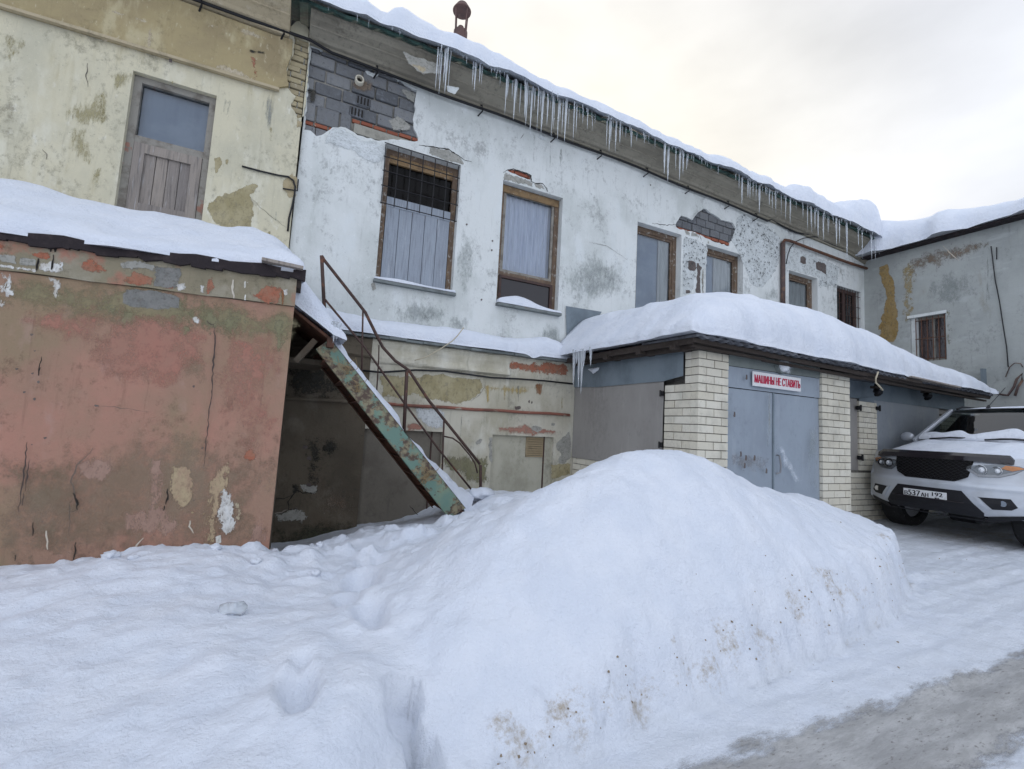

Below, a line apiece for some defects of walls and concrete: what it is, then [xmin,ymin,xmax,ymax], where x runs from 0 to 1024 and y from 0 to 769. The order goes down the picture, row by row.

spalling [287,20,472,164]
peeling [207,184,258,227]
spalling [503,168,548,191]
peeling [0,245,63,307]
peeling [120,261,186,291]
spalling [652,209,839,294]
peeling [878,264,917,342]
crack [204,321,216,464]
flaking render [509,361,568,375]
crack [18,443,34,536]
peeling [125,459,241,545]
flaking render [476,423,571,479]